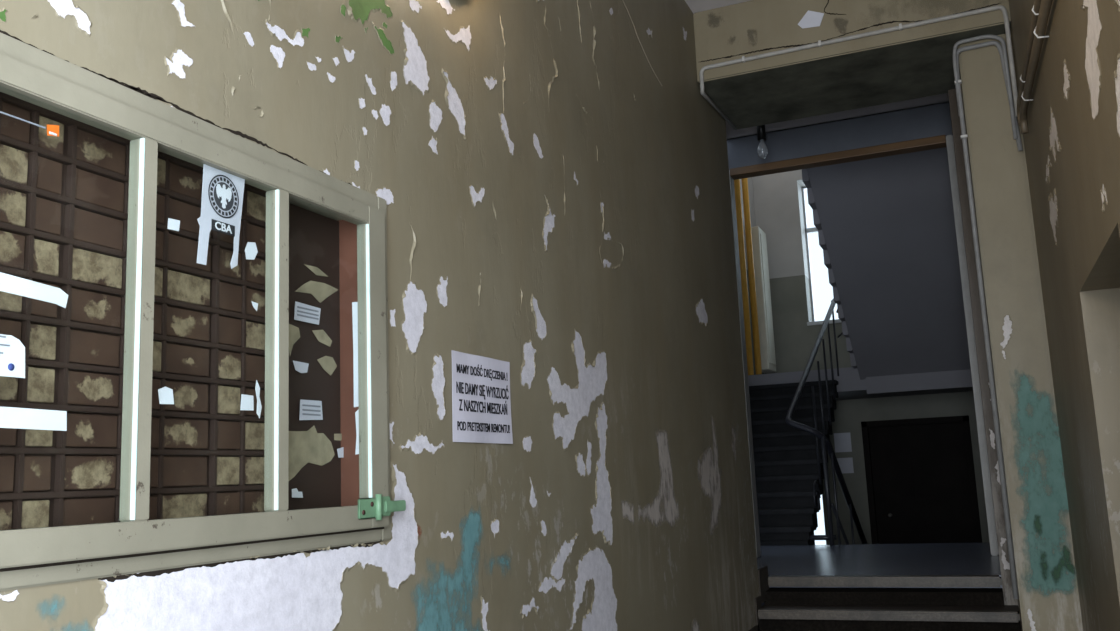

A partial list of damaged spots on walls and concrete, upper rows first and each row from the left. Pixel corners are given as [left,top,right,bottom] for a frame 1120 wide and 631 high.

peeling [47,0,92,37]
crack [0,30,350,184]
peeling [164,48,194,79]
peeling [264,19,311,69]
peeling [372,0,466,155]
peeling [436,0,472,53]
crack [701,0,924,62]
peeling [1081,0,1120,138]
peeling [389,275,448,355]
peeling [430,353,446,422]
peeling [520,293,618,631]
peeling [91,420,445,631]